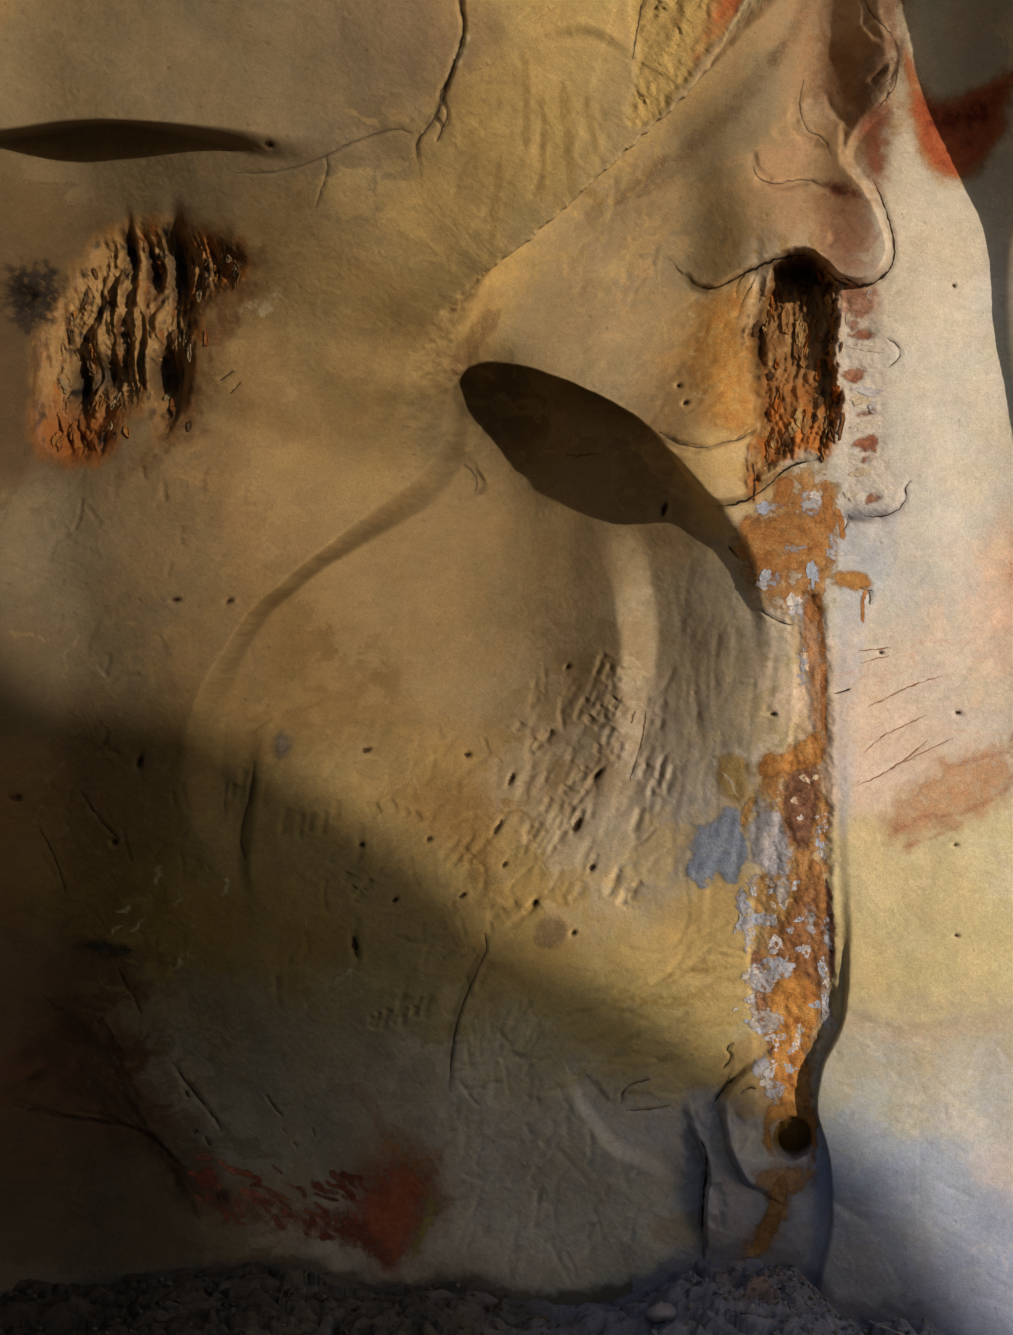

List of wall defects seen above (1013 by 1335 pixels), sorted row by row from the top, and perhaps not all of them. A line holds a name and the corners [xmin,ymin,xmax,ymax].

crack [239,0,464,208]
spalling [628,0,745,129]
rust [817,0,1013,179]
peeling [755,569,779,590]
peeling [785,534,839,619]
peeling [797,648,809,685]
rust [718,464,871,1259]
crack [450,932,487,1082]
peeling [687,797,837,1105]
rust [187,1118,445,1267]
crack [699,1141,707,1232]